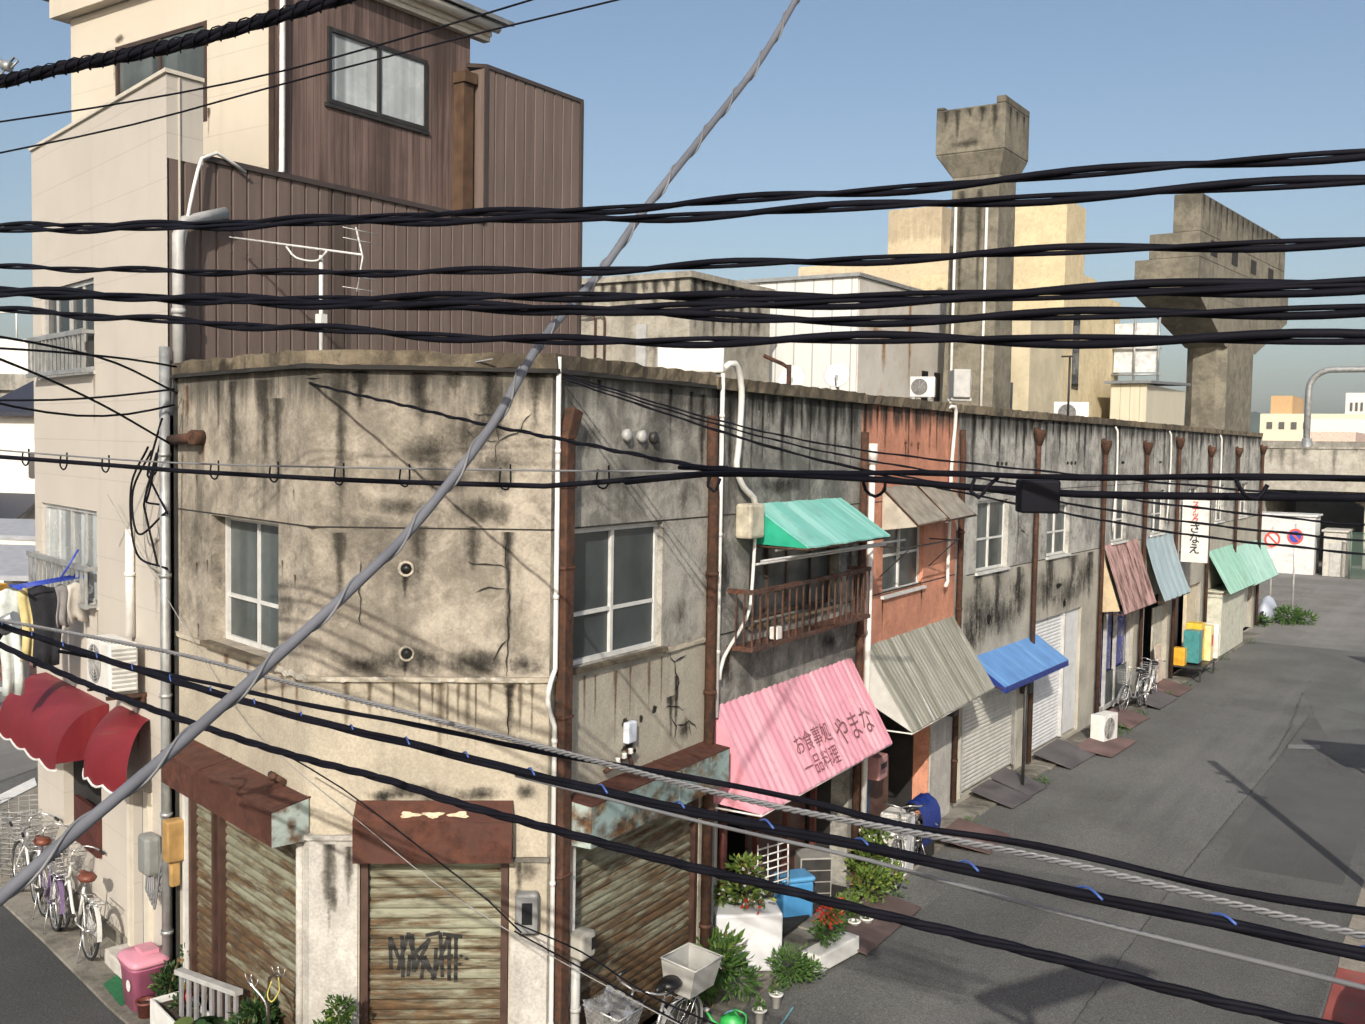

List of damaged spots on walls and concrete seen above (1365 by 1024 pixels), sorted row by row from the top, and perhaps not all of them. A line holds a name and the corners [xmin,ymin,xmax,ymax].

leakage [217,380,236,455]
leakage [257,379,281,446]
leakage [334,370,367,464]
leakage [411,372,430,409]
leakage [334,532,345,587]
leakage [463,500,513,597]
crack [468,532,511,735]
leakage [966,567,1025,645]
leakage [1042,551,1093,605]
leakage [394,652,533,726]
crack [666,655,697,738]
leakage [324,844,353,907]